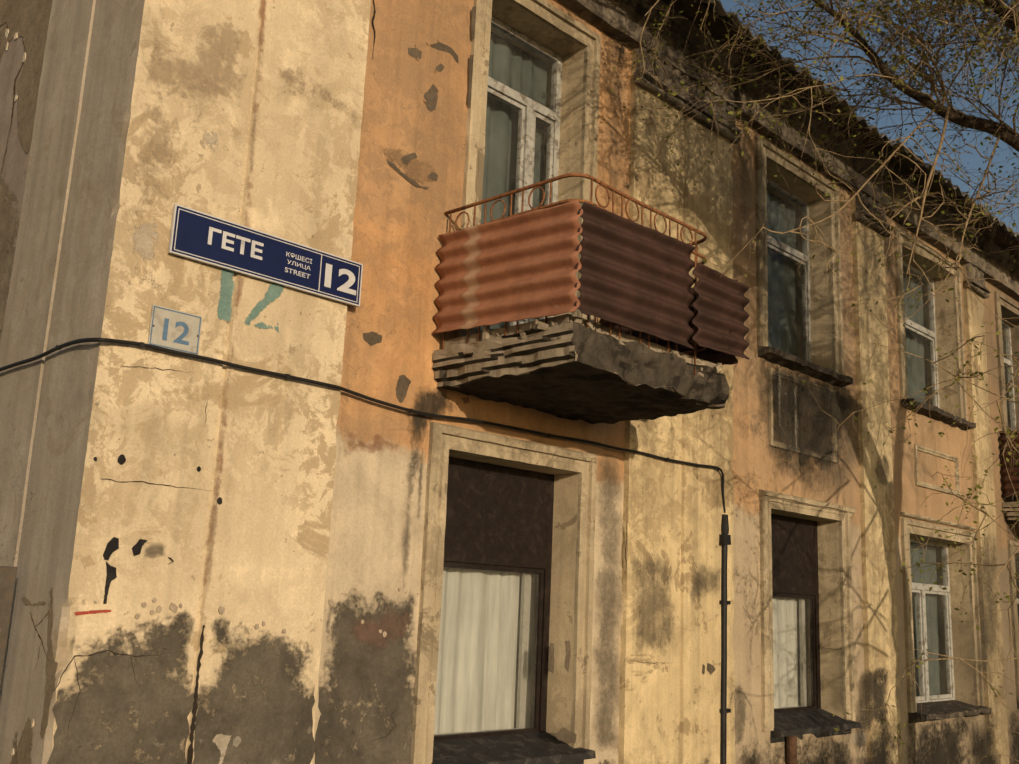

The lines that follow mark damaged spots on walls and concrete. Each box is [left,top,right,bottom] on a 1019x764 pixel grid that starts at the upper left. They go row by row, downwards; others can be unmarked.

flaking render [0,0,53,154]
spalling [424,84,440,112]
spalling [408,39,474,107]
flaking render [0,177,20,344]
damp [763,366,858,479]
damp [693,574,716,592]
crack [30,603,205,764]
flaking render [11,587,416,764]
damp [353,614,410,648]
spalling [549,640,571,673]
damp [859,668,888,749]